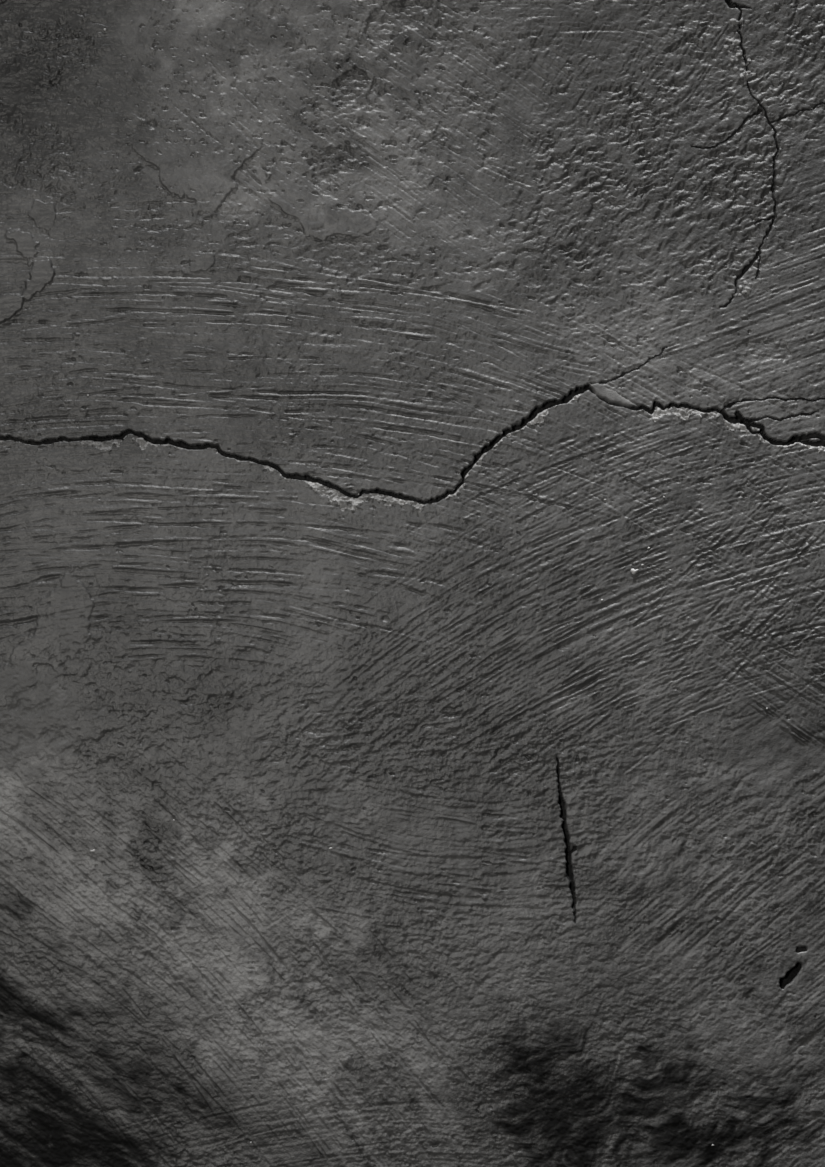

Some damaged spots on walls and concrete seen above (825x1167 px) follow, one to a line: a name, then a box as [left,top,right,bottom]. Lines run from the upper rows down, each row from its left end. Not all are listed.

crack [691,0,825,308]
crack [0,347,825,512]